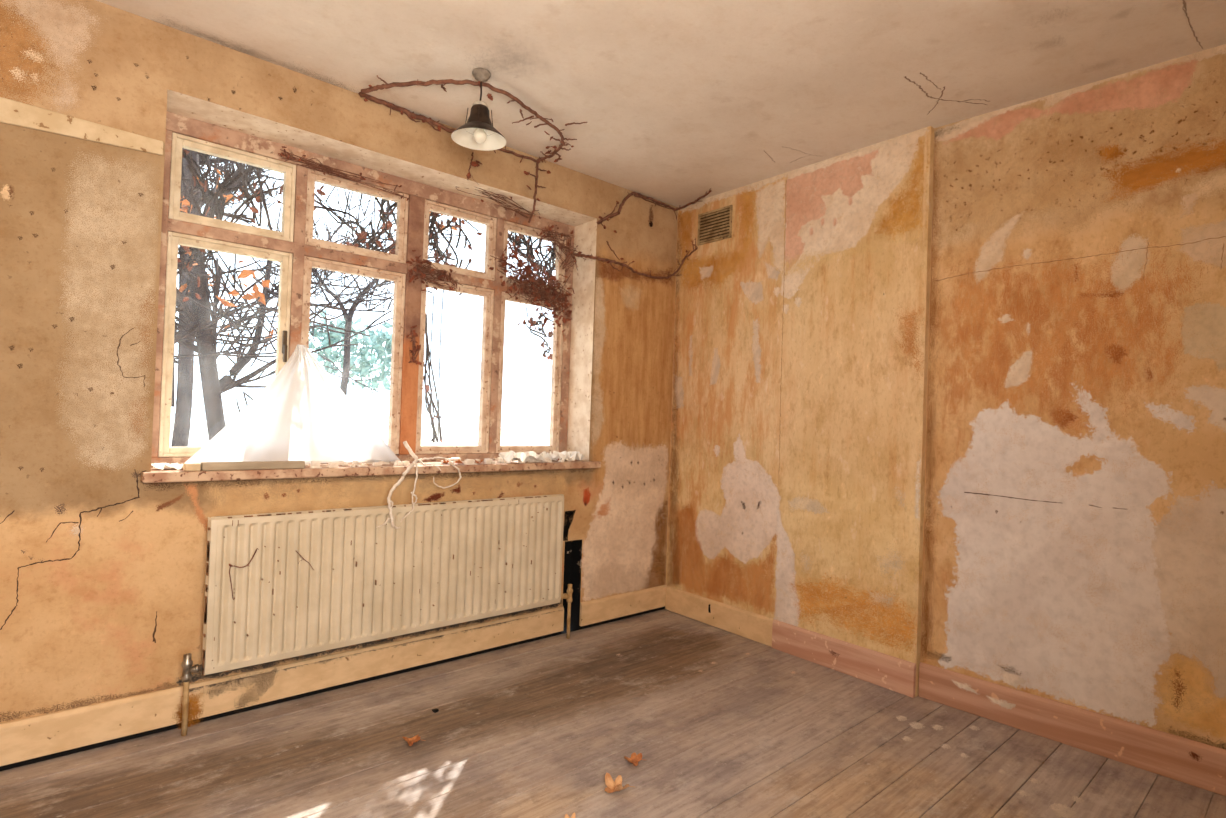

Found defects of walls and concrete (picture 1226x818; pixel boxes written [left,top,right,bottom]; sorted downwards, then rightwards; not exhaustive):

crack [1182,0,1203,49]
crack [904,72,986,115]
peeling [755,130,922,314]
peeling [971,211,1026,285]
peeling [1107,233,1151,293]
crack [117,328,145,387]
peeling [997,313,1031,336]
flaking render [563,277,669,601]
flaking render [1144,401,1196,435]
crack [0,469,146,630]
flaking render [694,433,801,627]
flaking render [936,351,1177,727]